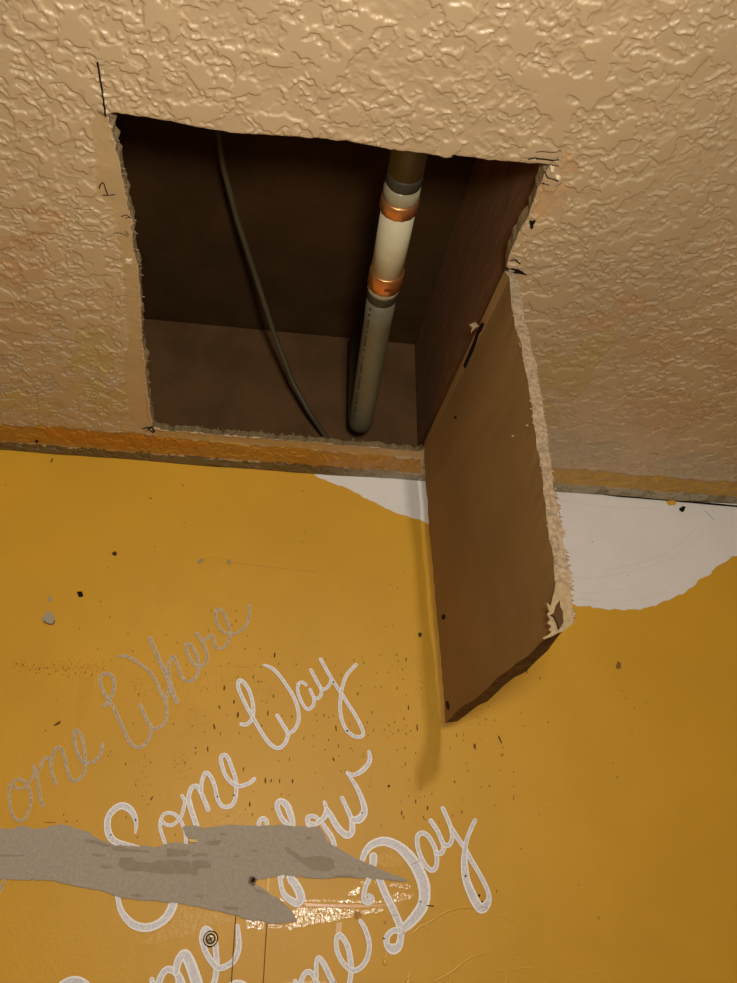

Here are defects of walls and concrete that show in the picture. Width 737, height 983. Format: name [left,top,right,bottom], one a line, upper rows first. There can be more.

peeling [0,824,408,923]